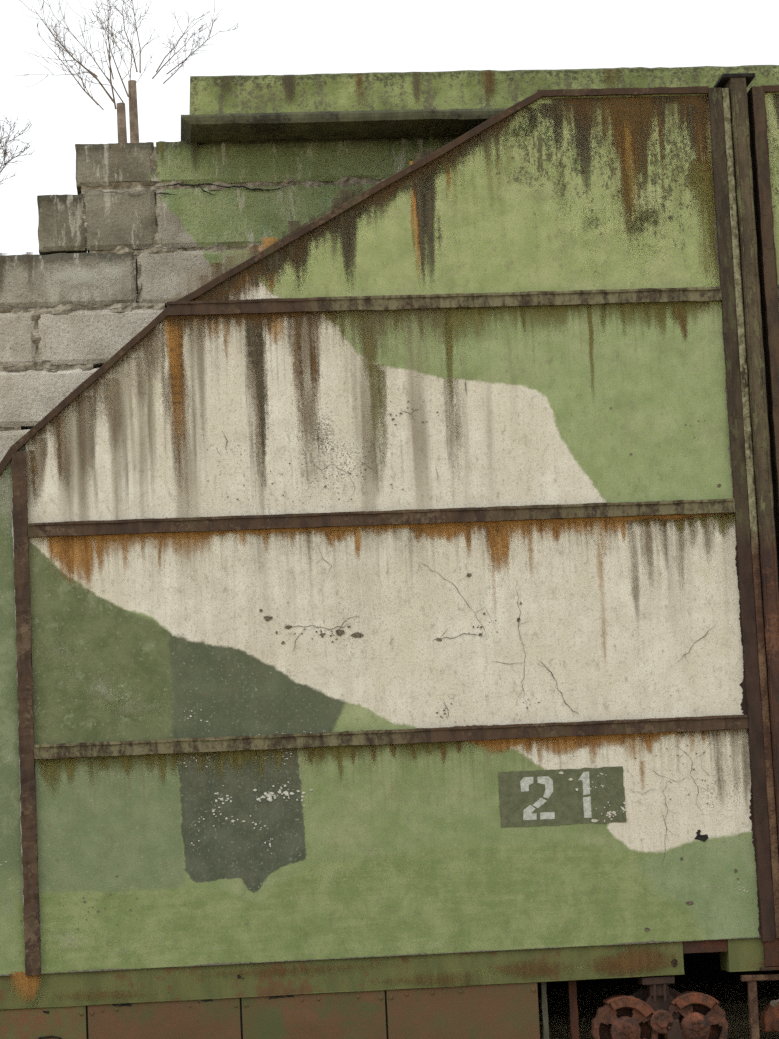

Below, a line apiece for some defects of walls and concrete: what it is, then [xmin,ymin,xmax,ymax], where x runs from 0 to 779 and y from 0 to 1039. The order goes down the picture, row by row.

corrosion [602,97,650,212]
corrosion [192,237,277,301]
corrosion [39,416,61,473]
corrosion [165,312,336,464]
corrosion [445,315,454,449]
corrosion [49,513,735,580]
spalling [260,609,364,644]
crack [285,616,357,651]
crack [422,563,579,716]
spalling [735,543,747,715]
crack [646,744,714,860]
spalling [698,786,762,941]